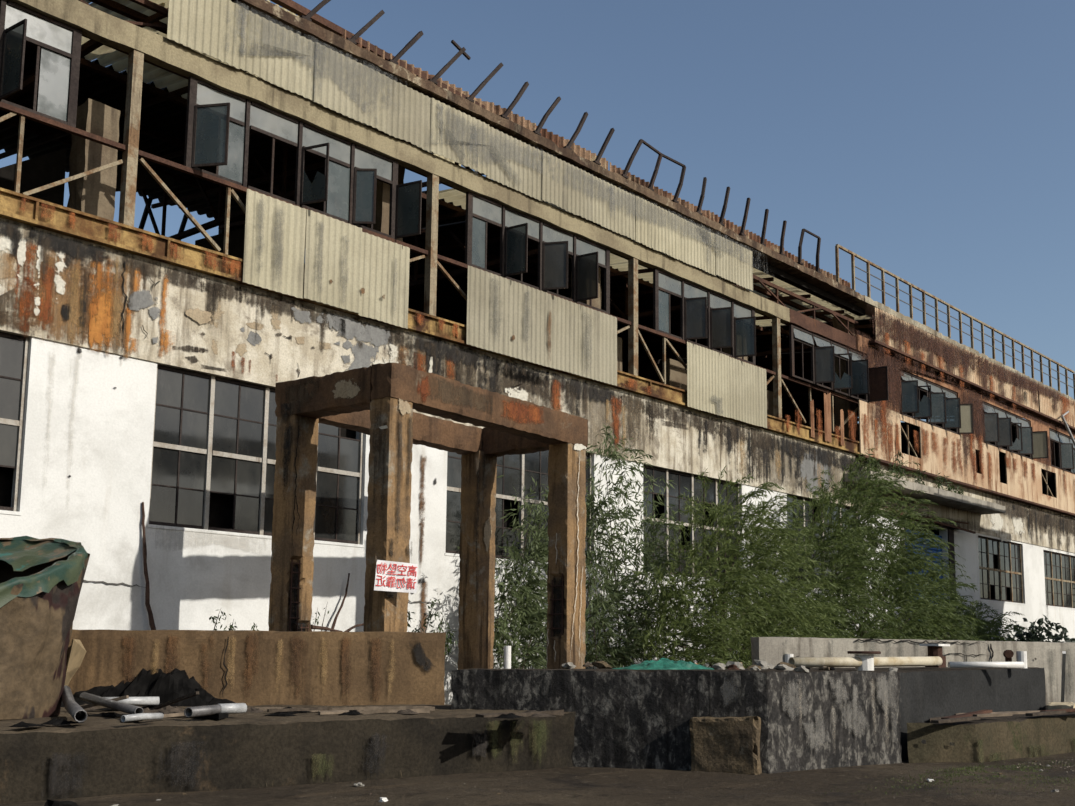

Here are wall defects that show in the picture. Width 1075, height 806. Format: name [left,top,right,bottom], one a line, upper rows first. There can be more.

peeling [0,236,43,315]
peeling [54,251,67,299]
corrosion [5,244,141,356]
corrosion [160,278,170,353]
corrosion [204,251,241,275]
peeling [235,310,281,356]
spalling [319,339,399,399]
damp [0,210,918,509]
corrosion [503,380,561,424]
corrosion [835,307,1075,483]